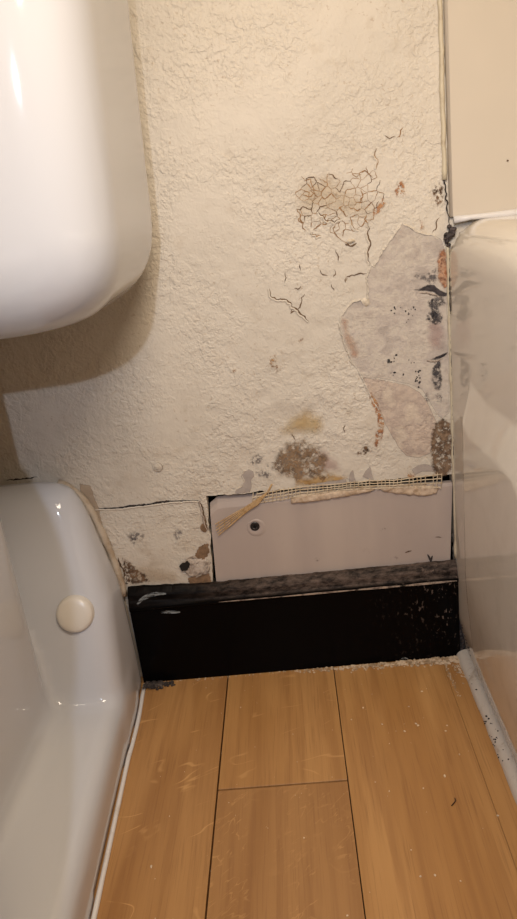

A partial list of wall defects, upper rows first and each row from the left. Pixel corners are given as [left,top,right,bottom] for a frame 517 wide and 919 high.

crack [267,129,402,323]
peeling [338,223,449,418]
damp [252,441,343,485]
damp [431,419,452,478]
spalling [80,484,102,524]
spalling [179,544,211,583]